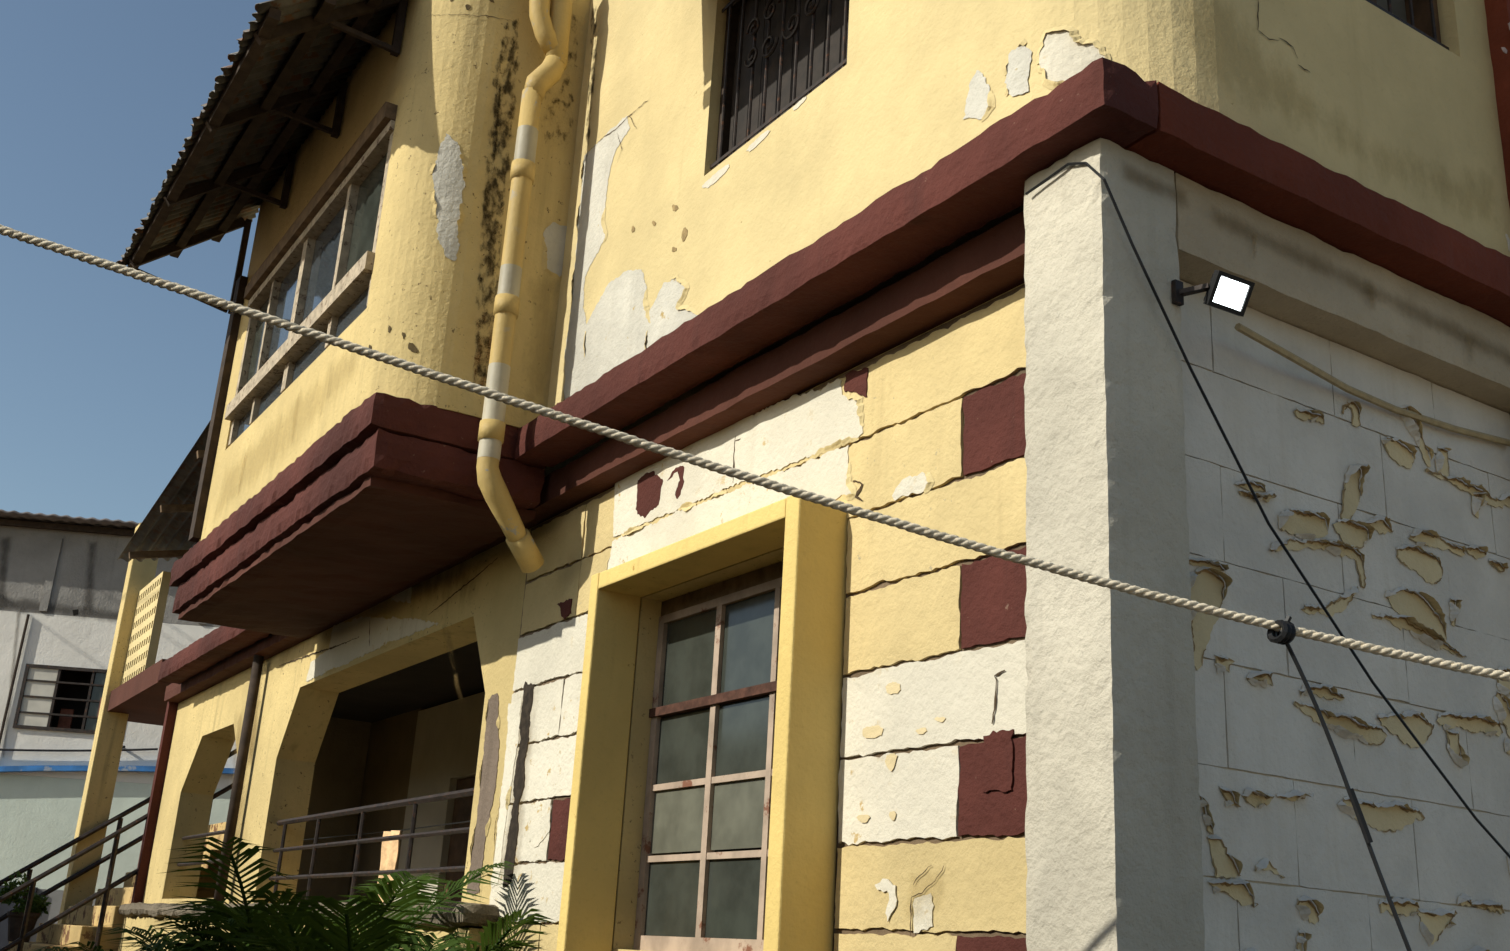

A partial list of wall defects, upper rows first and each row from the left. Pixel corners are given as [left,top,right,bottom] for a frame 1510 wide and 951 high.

peeling [962,25,1111,122]
crack [1257,0,1310,72]
peeling [429,134,468,261]
leakage [476,20,518,377]
peeling [542,116,700,401]
leakage [0,540,118,679]
peeling [1189,557,1273,688]
peeling [1235,463,1509,658]
peeling [1293,666,1510,769]
peeling [875,879,934,933]
peeling [1199,786,1314,908]
peeling [1337,796,1425,832]